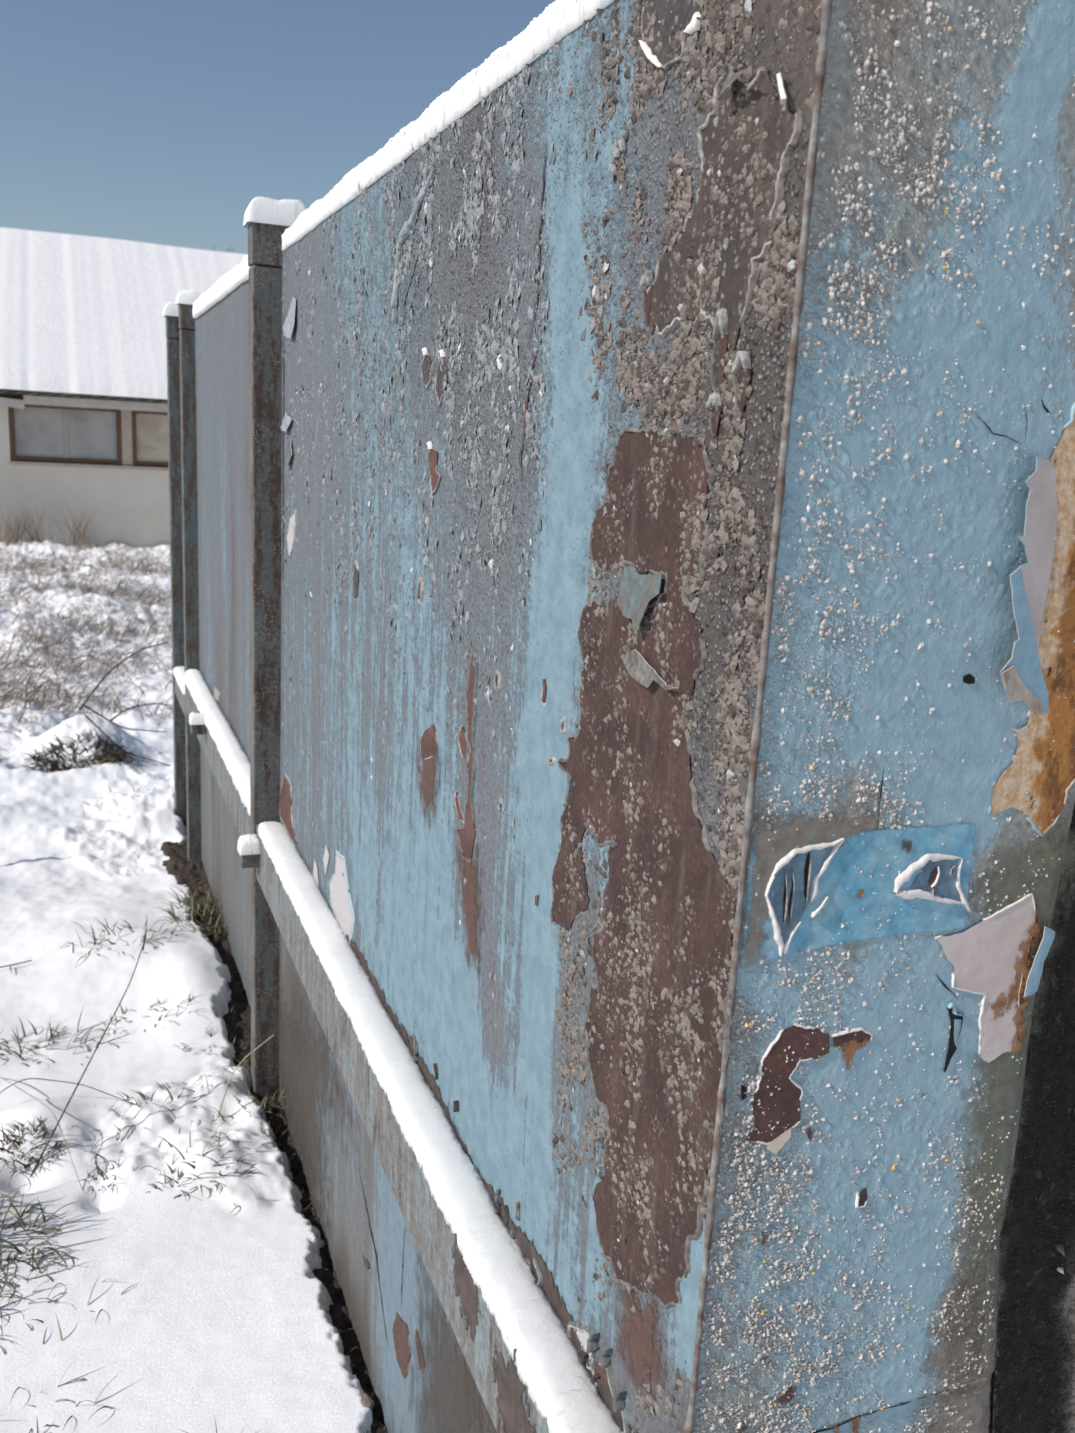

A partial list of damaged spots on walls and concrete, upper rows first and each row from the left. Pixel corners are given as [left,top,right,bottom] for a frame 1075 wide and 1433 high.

corrosion [417,741,440,824]
peeling [280,0,701,1433]
peeling [535,66,873,1309]
corrosion [988,402,1075,837]
corrosion [457,843,480,975]
peeling [935,893,1055,1063]
corrosion [834,1416,861,1433]